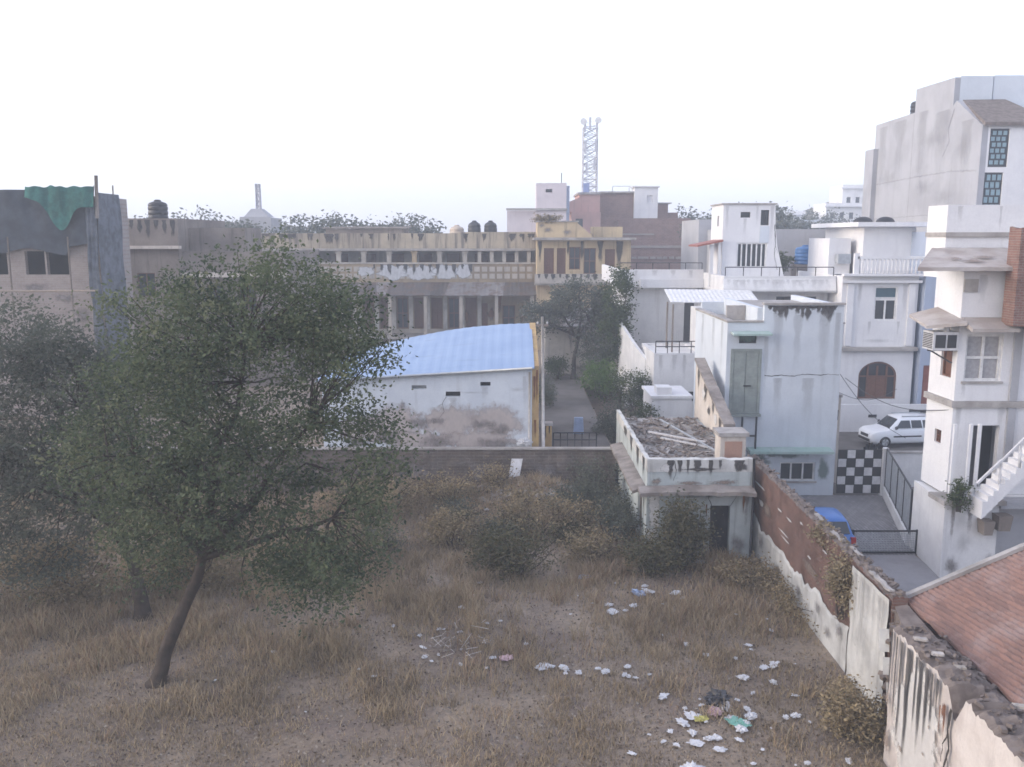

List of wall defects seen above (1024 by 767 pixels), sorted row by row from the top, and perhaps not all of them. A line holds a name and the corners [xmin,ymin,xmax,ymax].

peeling [358,264,471,281]
leakage [768,306,838,319]
leakage [667,460,747,476]
leakage [888,631,940,744]